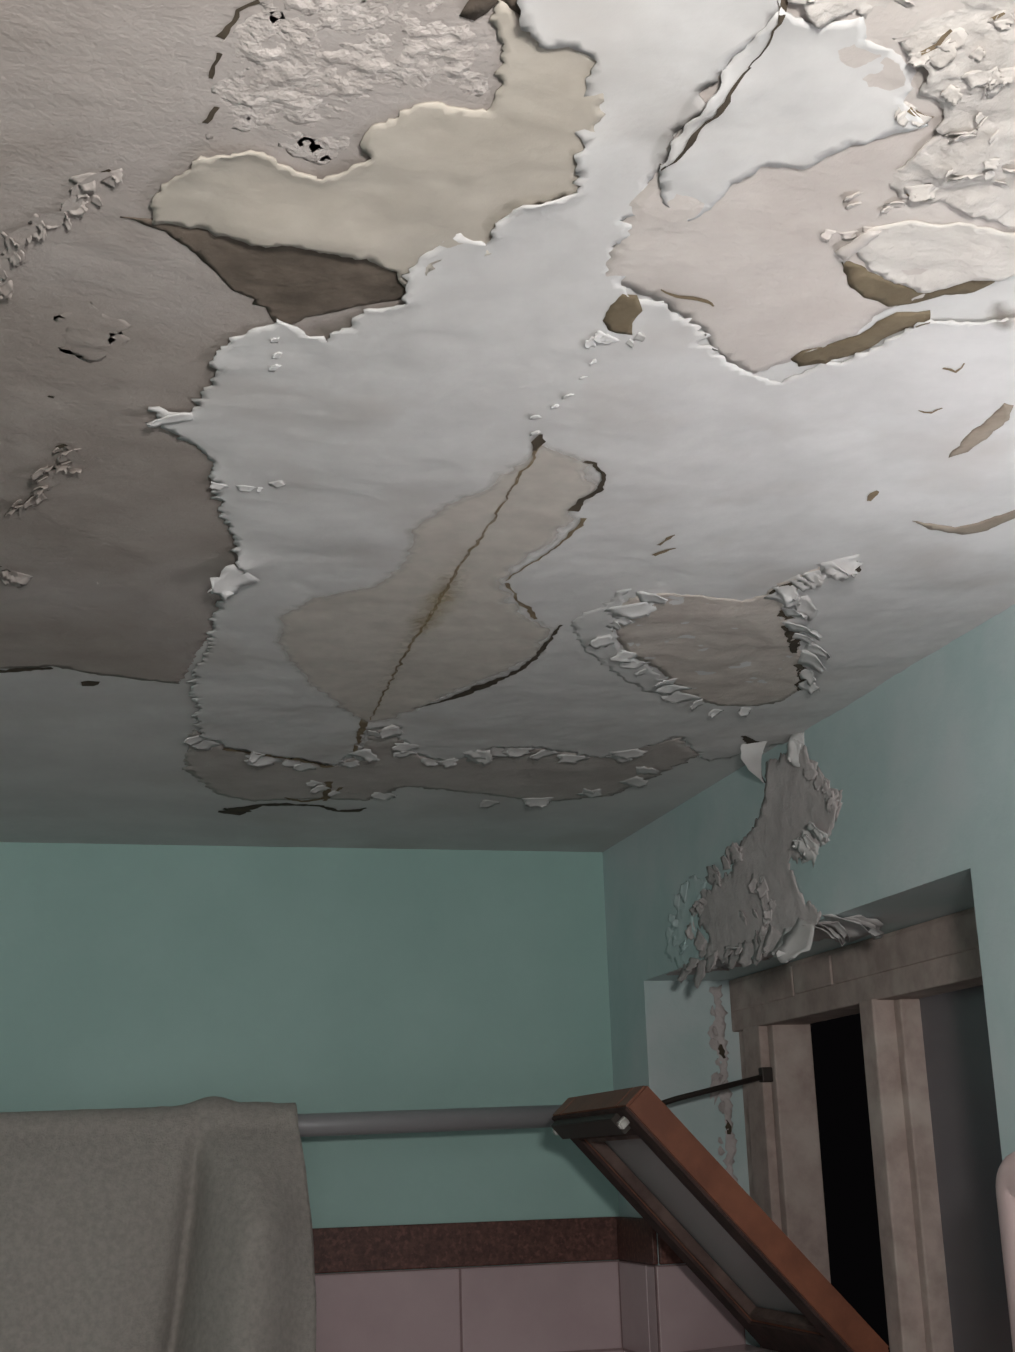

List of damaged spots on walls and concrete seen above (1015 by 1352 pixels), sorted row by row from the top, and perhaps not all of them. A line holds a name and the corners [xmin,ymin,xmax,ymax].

crack [218,434,546,815]
peeling [0,0,1015,989]
crack [418,461,606,708]